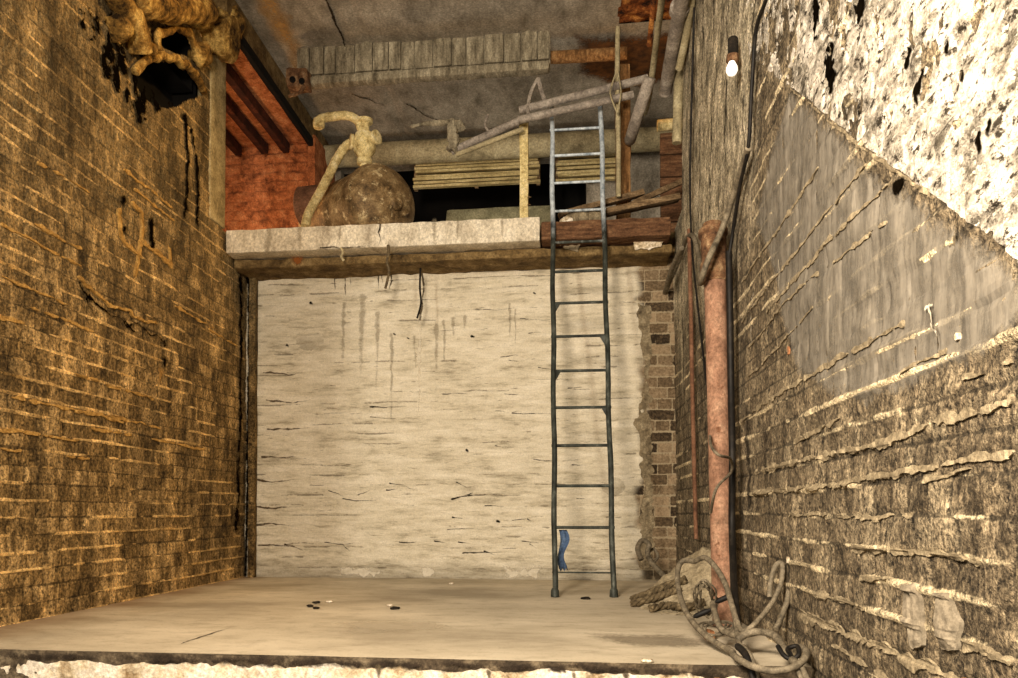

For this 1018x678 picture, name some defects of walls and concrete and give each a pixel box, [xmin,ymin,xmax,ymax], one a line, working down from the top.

crack [325,0,346,47]
corrosion [577,0,668,87]
crack [181,112,200,225]
peeling [746,0,1018,260]
flaking render [633,303,655,570]
peeling [0,660,704,678]